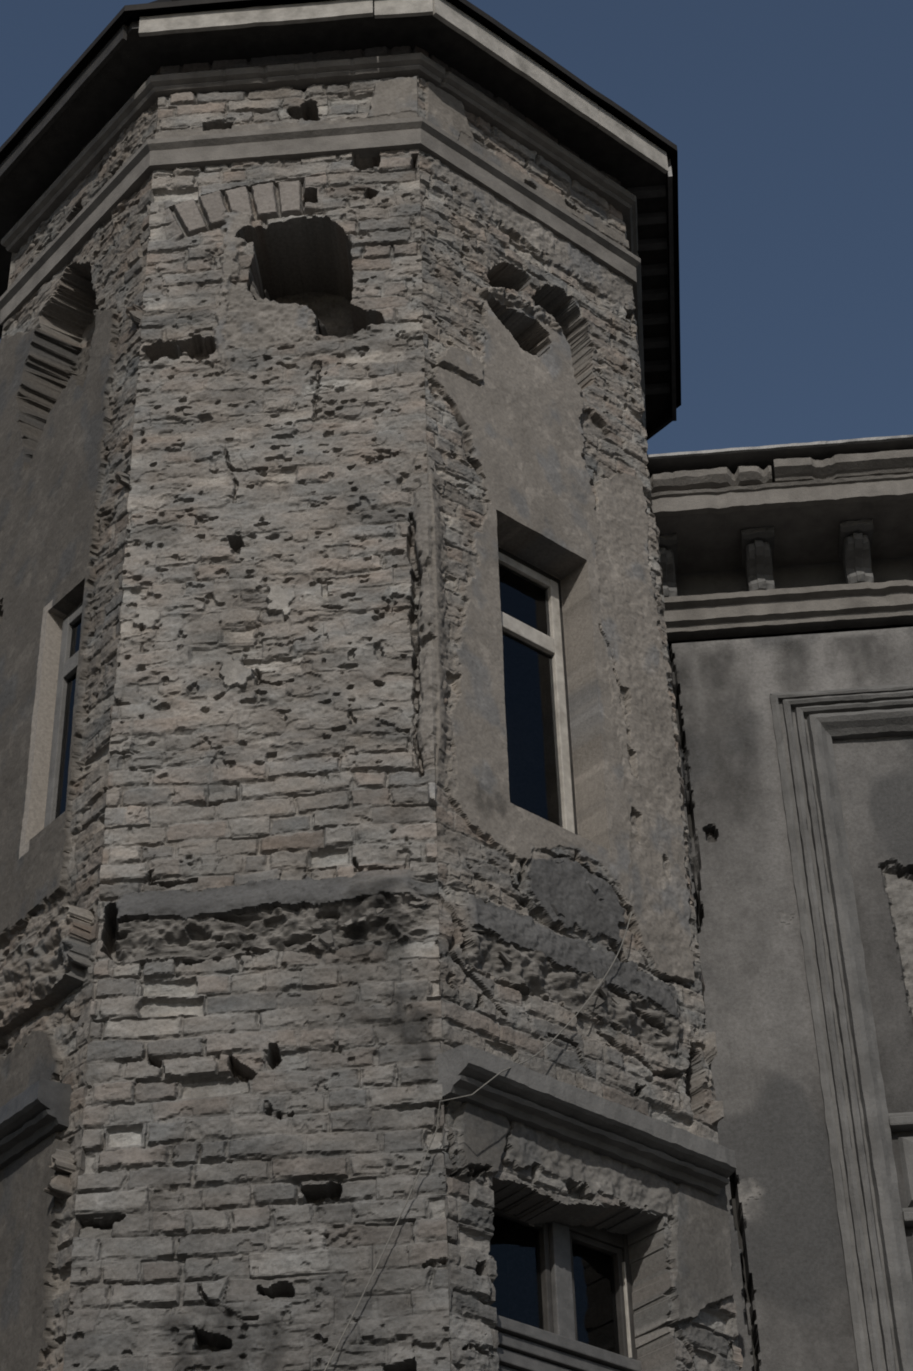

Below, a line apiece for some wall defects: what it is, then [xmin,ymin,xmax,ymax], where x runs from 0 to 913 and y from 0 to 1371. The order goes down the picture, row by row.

crack [428,371,480,467]
crack [408,518,424,778]
spalling [113,894,429,968]
spalling [460,926,683,1055]
spalling [883,870,913,1014]